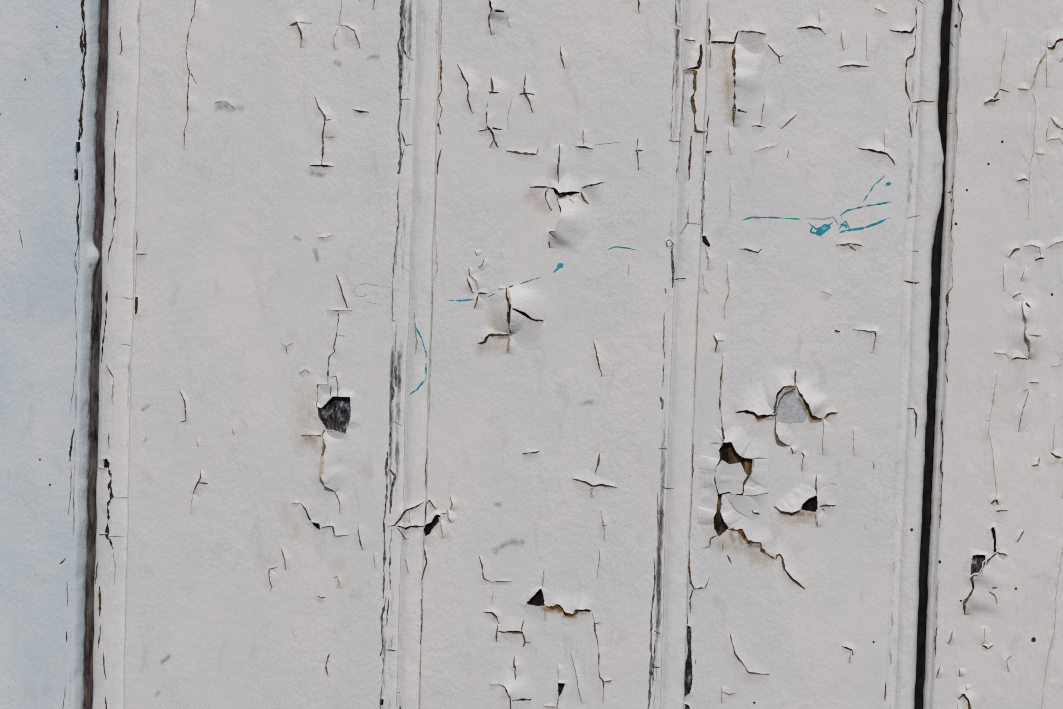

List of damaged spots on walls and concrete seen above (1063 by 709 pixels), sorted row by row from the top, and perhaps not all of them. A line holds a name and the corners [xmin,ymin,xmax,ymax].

crack [176,0,237,149]
peeling [477,74,520,152]
peeling [528,141,608,253]
peeling [856,0,935,167]
peeling [983,27,1063,219]
peeling [459,249,550,356]
peeling [994,235,1063,369]
peeling [292,388,372,550]
peeling [387,495,461,574]
peeling [474,554,612,709]
peeling [697,363,866,593]
peeling [955,492,1024,672]